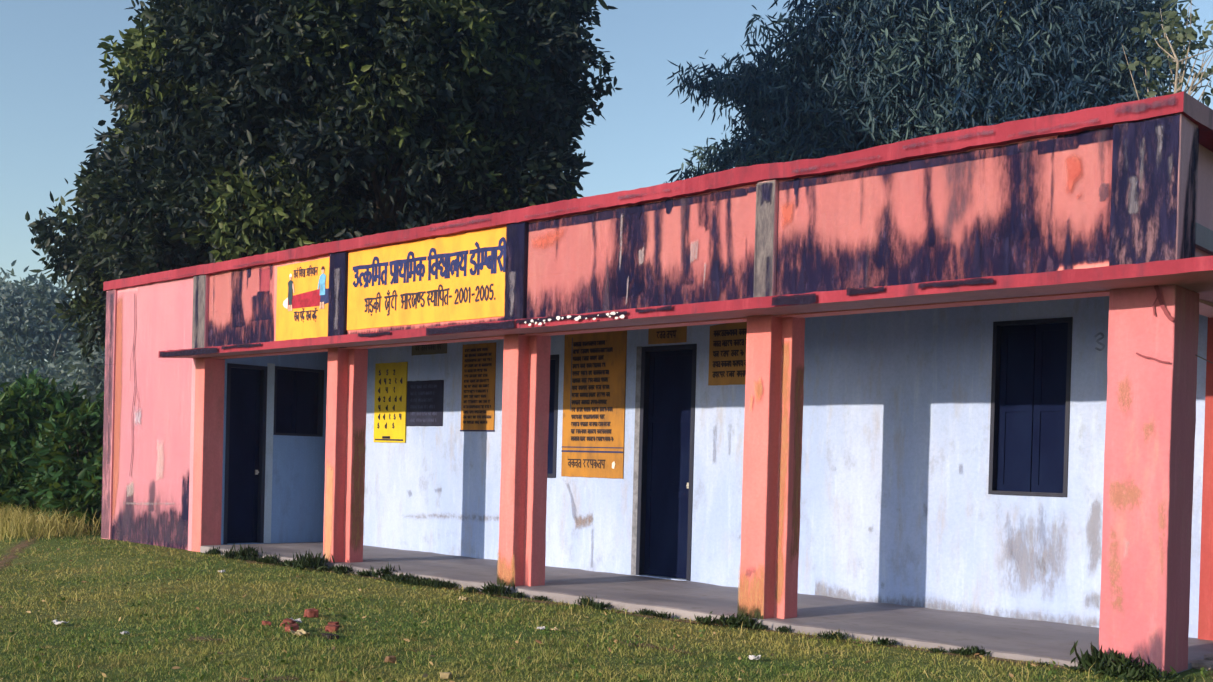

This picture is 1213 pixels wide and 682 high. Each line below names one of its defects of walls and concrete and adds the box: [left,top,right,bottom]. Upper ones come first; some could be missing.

damp [101,290,190,550]
damp [159,261,274,357]
damp [327,97,1199,337]